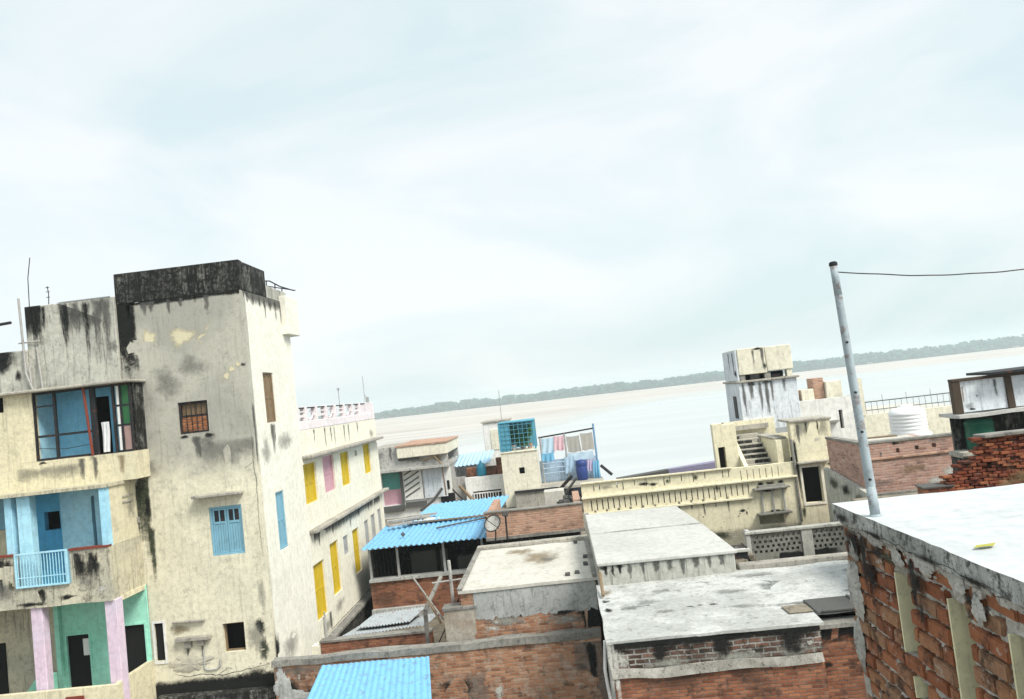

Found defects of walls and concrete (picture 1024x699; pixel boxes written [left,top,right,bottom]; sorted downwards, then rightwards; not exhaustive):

water stain [24,305,45,340]
water stain [58,290,281,371]
flaking render [170,324,210,346]
water stain [135,476,156,572]
water stain [73,553,99,579]
spalling [866,535,995,628]
water stain [586,625,854,699]